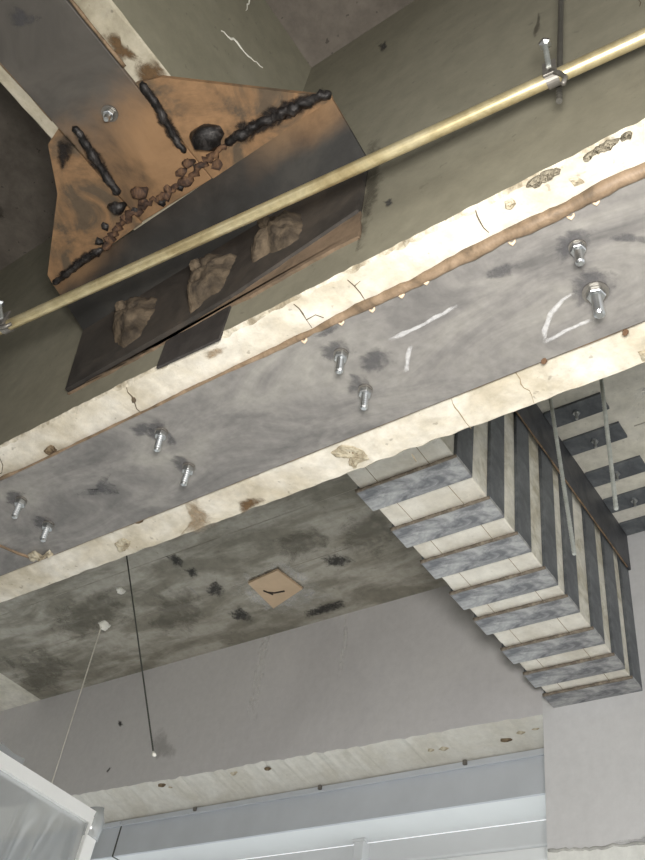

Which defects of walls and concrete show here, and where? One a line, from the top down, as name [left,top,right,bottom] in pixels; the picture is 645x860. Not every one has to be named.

spalling [583,131,632,161]
spalling [526,167,585,188]
spalling [331,445,369,469]
peeling [548,838,645,853]